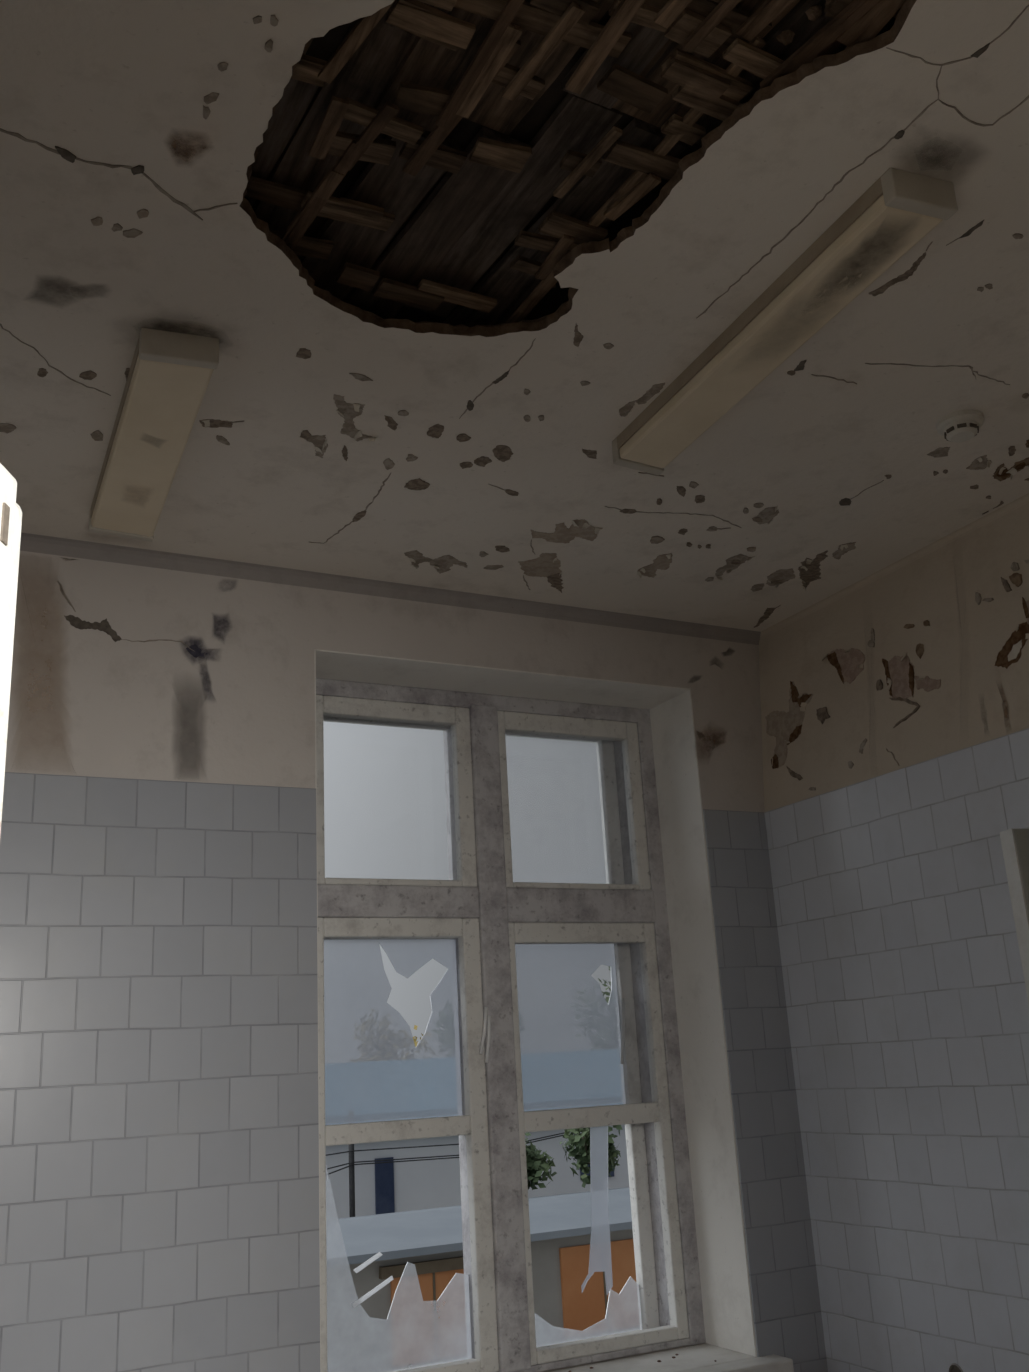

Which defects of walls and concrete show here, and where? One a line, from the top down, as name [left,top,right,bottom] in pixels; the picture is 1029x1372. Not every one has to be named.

crack [0,128,238,220]
crack [696,5,1029,319]
crack [0,323,111,396]
peeling [300,394,409,461]
peeling [427,424,471,442]
peeling [460,445,513,469]
crack [309,473,391,544]
peeling [404,519,603,593]
crack [57,581,194,651]
damp [178,618,228,756]
peeling [821,620,941,728]
peeling [765,681,830,791]